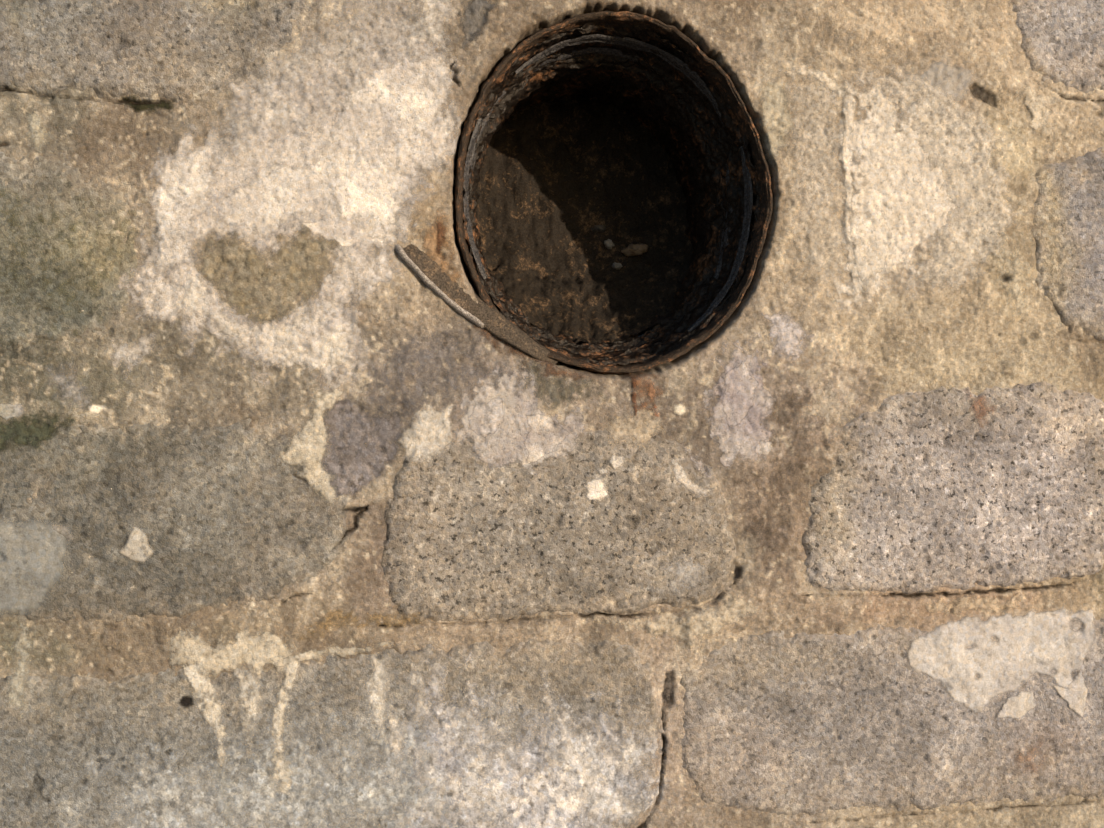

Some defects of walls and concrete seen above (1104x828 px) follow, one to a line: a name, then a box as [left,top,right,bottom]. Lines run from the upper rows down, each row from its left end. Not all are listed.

peeling [151,0,495,375]
corrosion [475,326,583,379]
peeling [908,608,1094,719]
water stain [87,623,666,828]
crack [658,716,666,797]